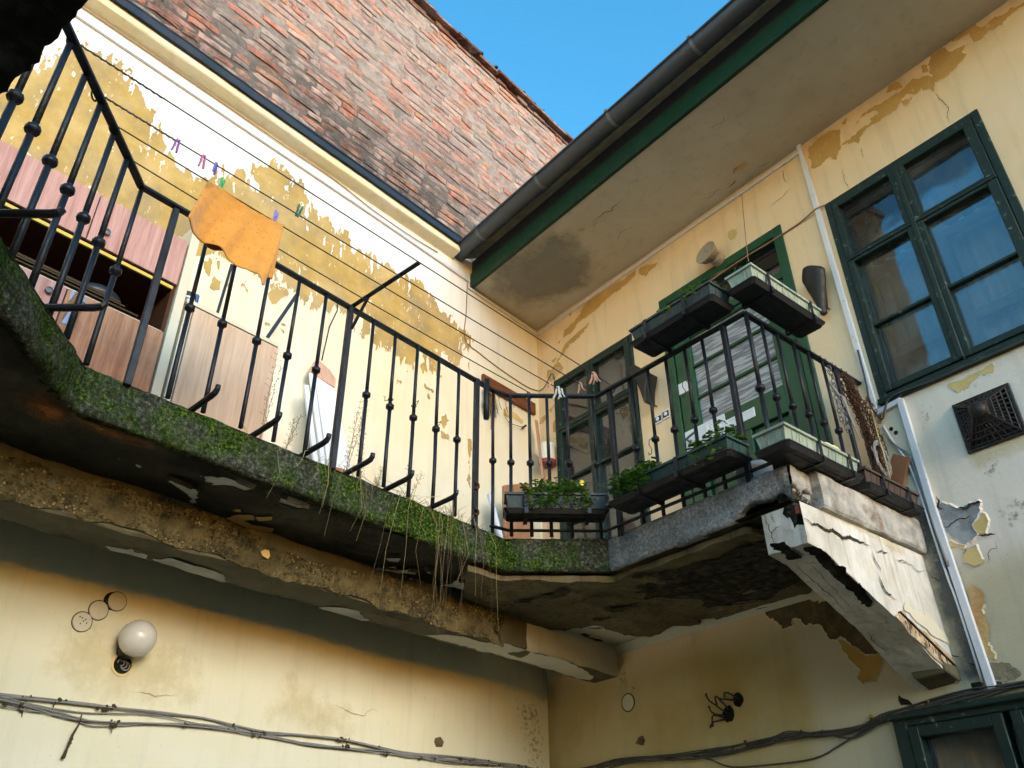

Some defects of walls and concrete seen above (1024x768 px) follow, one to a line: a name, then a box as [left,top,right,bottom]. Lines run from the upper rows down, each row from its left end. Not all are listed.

peeling [795,2,1024,170]
peeling [0,31,474,401]
water stain [504,237,584,298]
peeling [439,413,450,440]
peeling [947,362,995,392]
spalling [0,455,505,647]
spalling [593,486,885,685]
crack [805,518,940,599]
spalling [936,499,991,568]
peeling [967,583,1021,685]